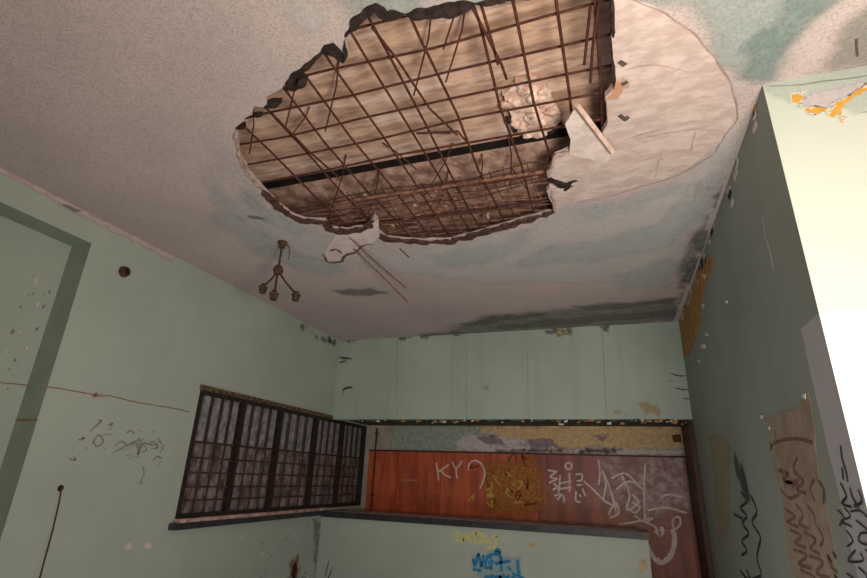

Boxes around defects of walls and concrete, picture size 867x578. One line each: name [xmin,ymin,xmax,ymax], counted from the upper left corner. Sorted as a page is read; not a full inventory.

leakage [746,0,827,79]
leakage [833,14,867,65]
peeling [790,82,867,125]
leakage [221,170,721,340]
peeling [680,222,715,364]
peeling [357,419,693,456]
peeling [760,392,838,578]